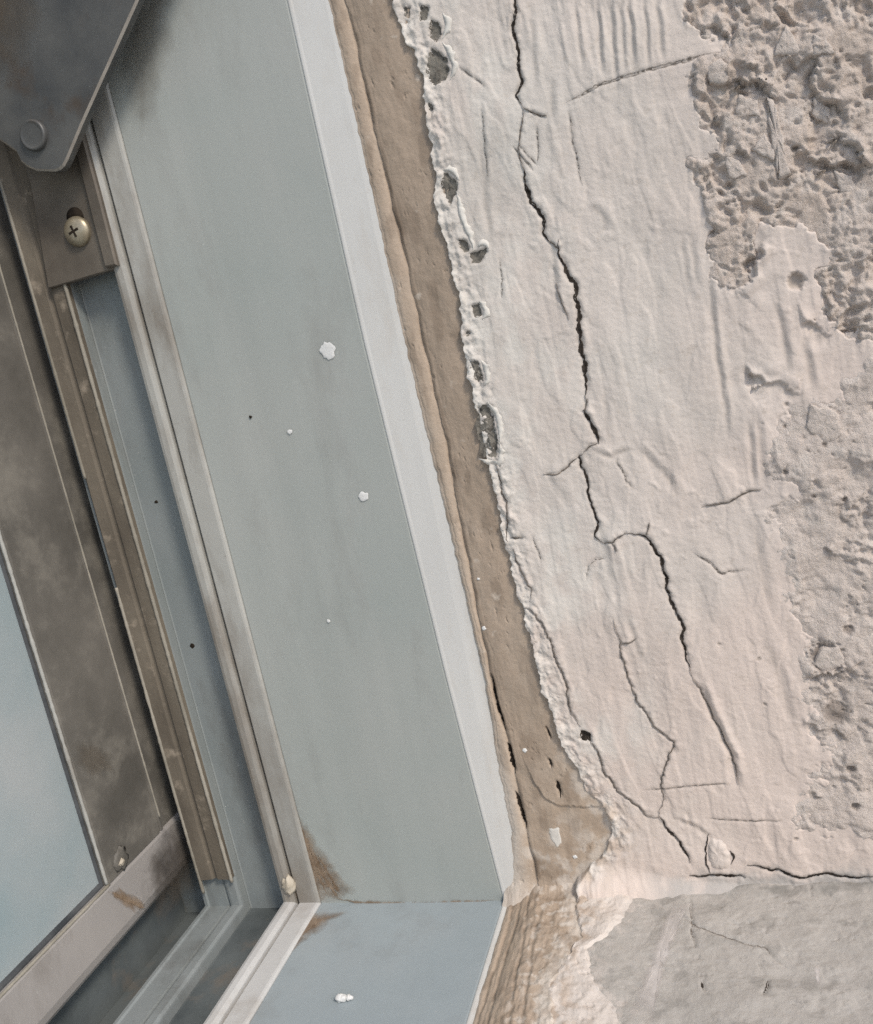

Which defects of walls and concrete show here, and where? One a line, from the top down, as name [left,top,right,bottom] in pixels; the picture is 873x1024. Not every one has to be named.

peeling [404,5,459,85]
spalling [683,0,873,343]
peeling [441,165,489,263]
peeling [472,301,490,320]
peeling [468,358,491,386]
crack [511,0,739,785]
spalling [746,370,763,394]
peeling [475,403,505,467]
spalling [762,356,873,840]
crack [497,470,873,879]
rust [302,830,400,903]
rust [299,915,335,940]